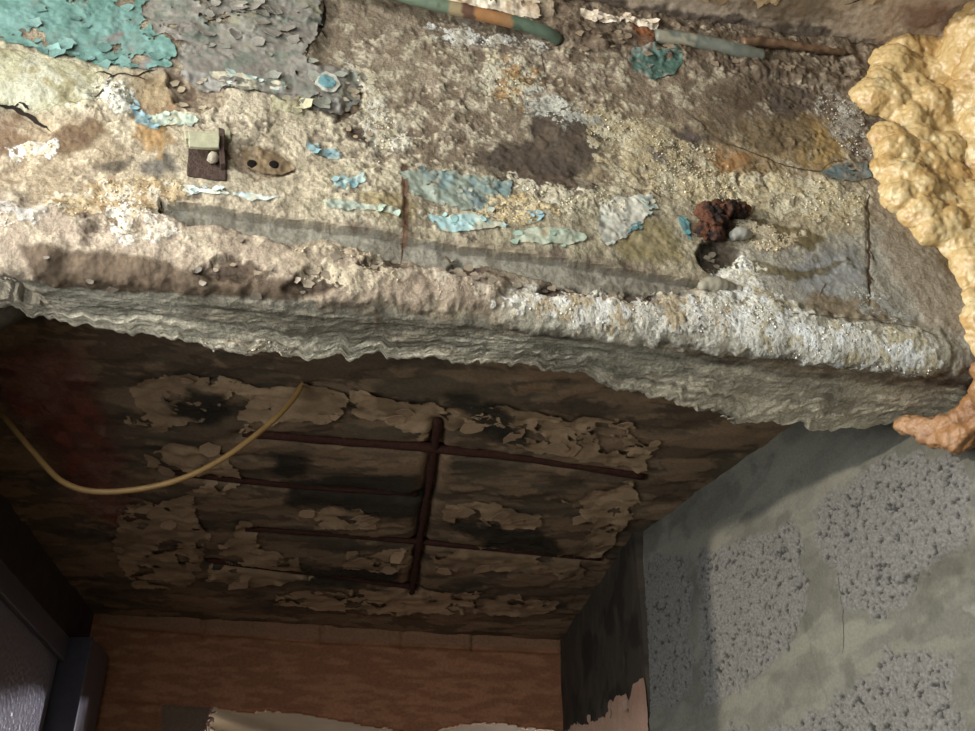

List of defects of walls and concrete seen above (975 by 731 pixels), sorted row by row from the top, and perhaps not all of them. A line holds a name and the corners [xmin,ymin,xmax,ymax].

peeling [450,0,541,18]
peeling [0,0,373,145]
crack [0,102,51,132]
peeling [182,184,279,201]
peeling [323,172,401,217]
peeling [399,166,587,247]
peeling [597,194,659,246]
spalling [22,244,342,300]
spalling [161,205,753,303]
peeling [111,373,661,618]
flaking render [565,678,648,731]